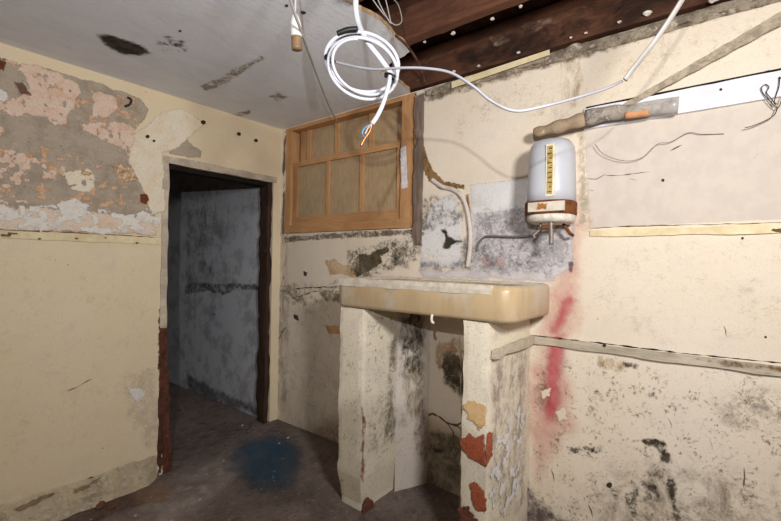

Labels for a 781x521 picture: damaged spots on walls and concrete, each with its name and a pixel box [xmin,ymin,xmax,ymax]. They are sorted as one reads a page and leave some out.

damp [101,35,150,56]
flaking render [0,58,155,218]
damp [348,237,439,277]
damp [422,199,573,274]
damp [385,314,423,414]
damp [442,353,464,395]
damp [595,363,659,419]
spalling [16,493,54,511]
damp [427,433,461,489]
peeling [457,400,527,521]
damp [494,447,611,521]
damp [612,422,737,520]